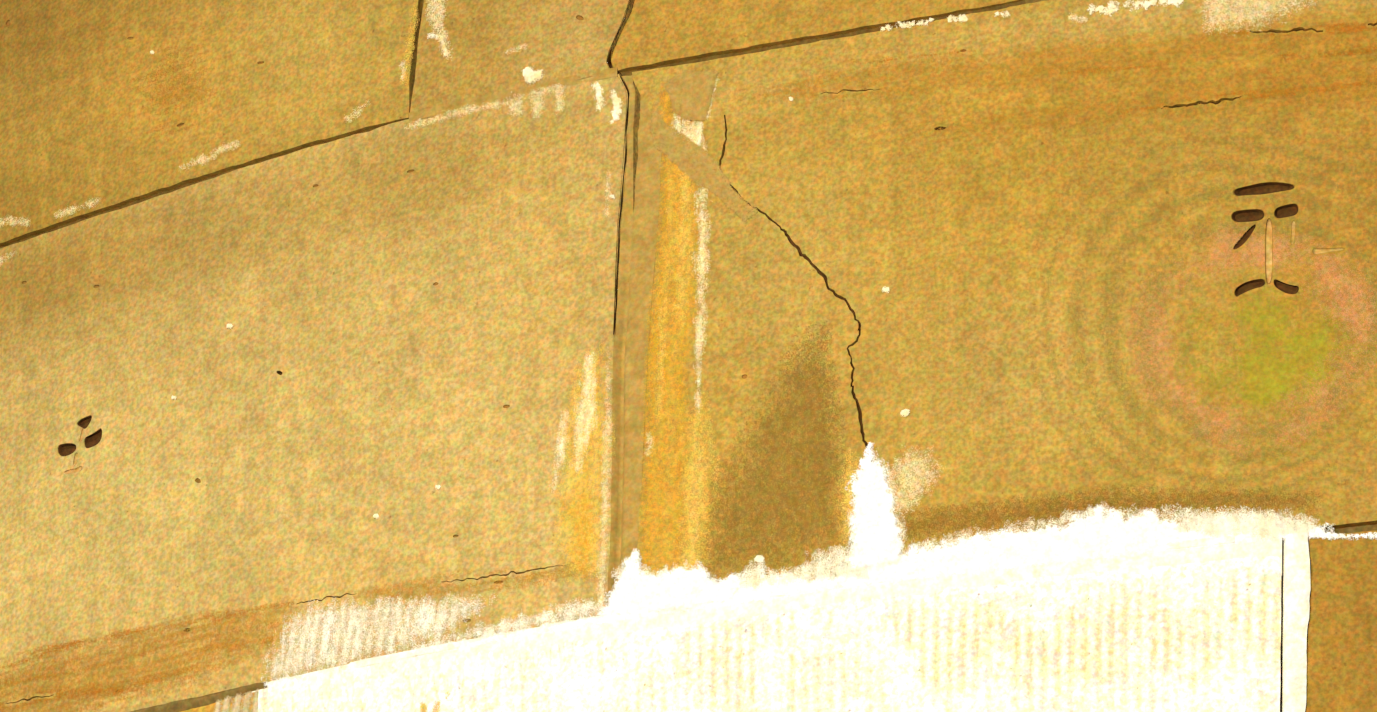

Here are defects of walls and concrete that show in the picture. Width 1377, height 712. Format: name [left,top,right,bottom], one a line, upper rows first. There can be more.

damp [638,82,851,581]
crack [720,117,872,461]
damp [894,120,1377,546]